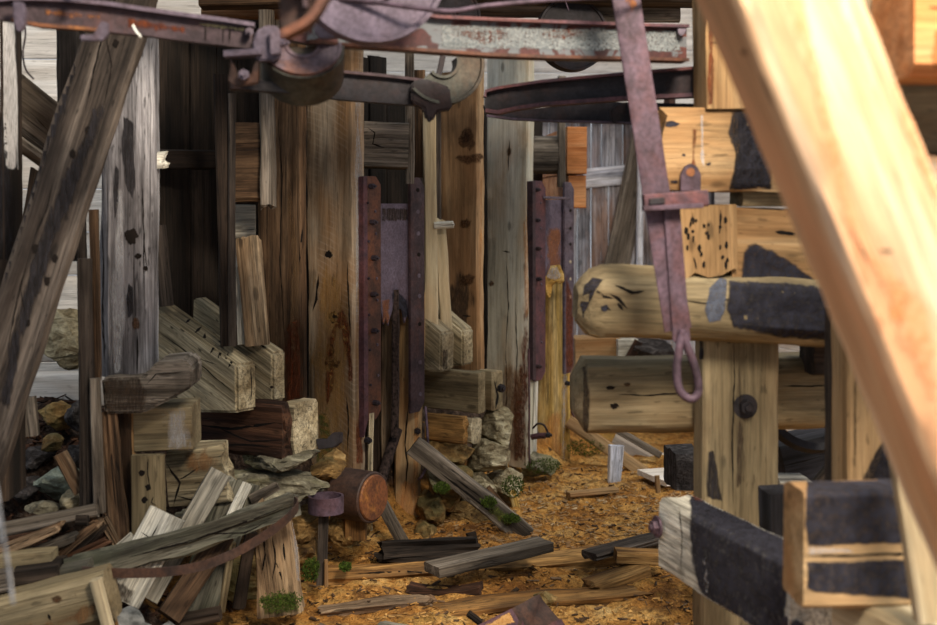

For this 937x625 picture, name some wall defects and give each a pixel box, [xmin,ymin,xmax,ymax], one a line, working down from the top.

rust [461,30,504,44]